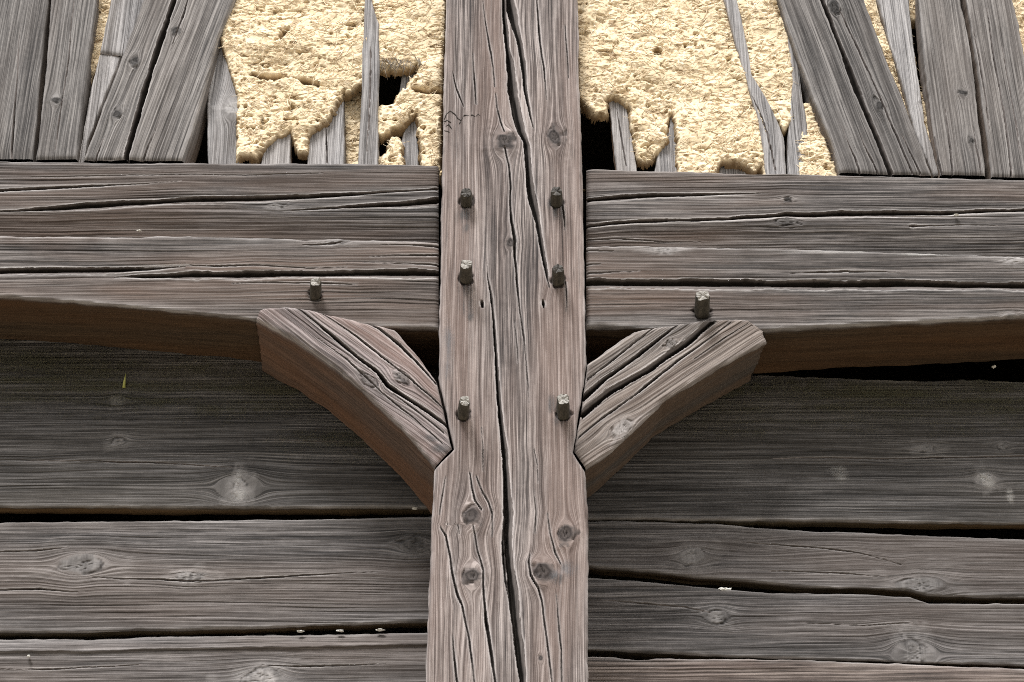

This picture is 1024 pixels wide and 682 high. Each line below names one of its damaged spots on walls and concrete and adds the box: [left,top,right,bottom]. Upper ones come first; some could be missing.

crack [0,0,439,212]
spalling [236,82,362,164]
spalling [378,108,424,166]
spalling [713,157,766,175]
spalling [771,107,794,138]
crack [298,309,447,445]
crack [409,0,1024,682]
crack [31,460,244,468]